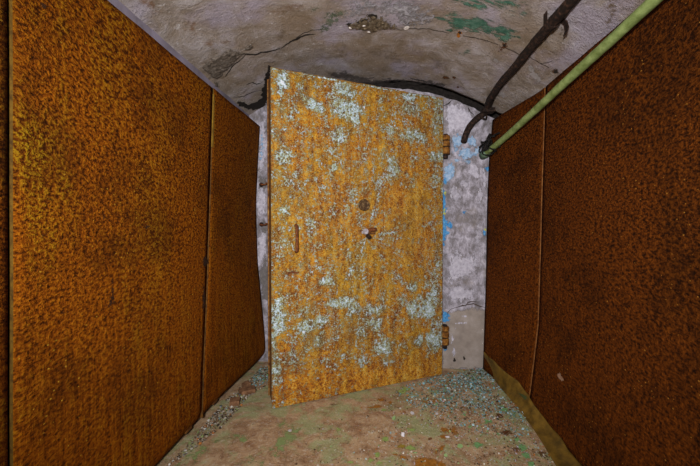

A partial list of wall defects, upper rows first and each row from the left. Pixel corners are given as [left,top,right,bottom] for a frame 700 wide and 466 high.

spalling [320,0,526,42]
crack [225,29,320,110]
peeling [443,103,489,246]
peeling [447,225,486,302]